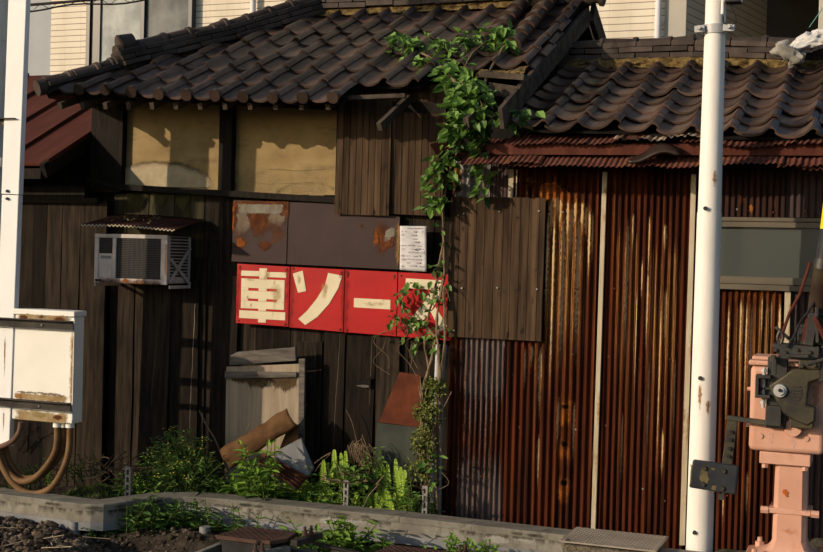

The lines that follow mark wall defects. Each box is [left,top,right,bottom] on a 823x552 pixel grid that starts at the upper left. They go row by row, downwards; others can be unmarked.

leakage [124,162,209,217]
corrosion [373,224,400,264]
corrosion [15,337,73,423]
corrosion [726,290,791,424]